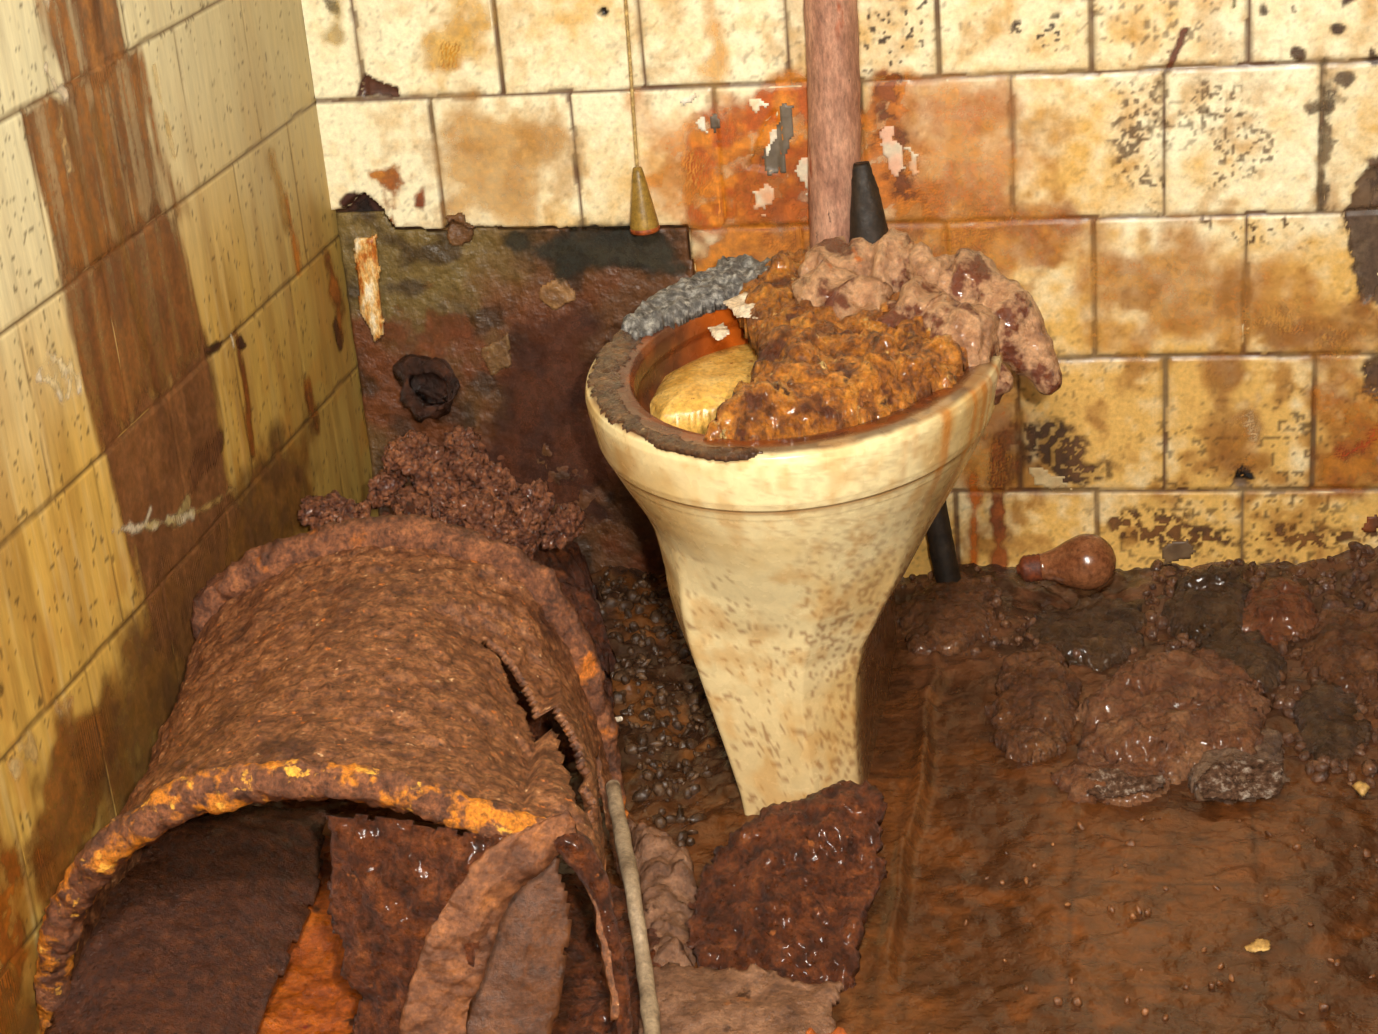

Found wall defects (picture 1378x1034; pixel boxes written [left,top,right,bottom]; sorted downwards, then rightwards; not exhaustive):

peeling [680,93,720,133]
rust [666,72,810,272]
peeling [749,99,808,217]
rust [861,71,1080,274]
water stain [1114,81,1164,187]
water stain [1291,47,1306,61]
water stain [1305,58,1354,211]
spalling [1344,157,1378,304]
rust [22,0,237,661]
spalling [336,192,694,576]
water stain [988,421,1110,491]
rust [0,710,118,1034]